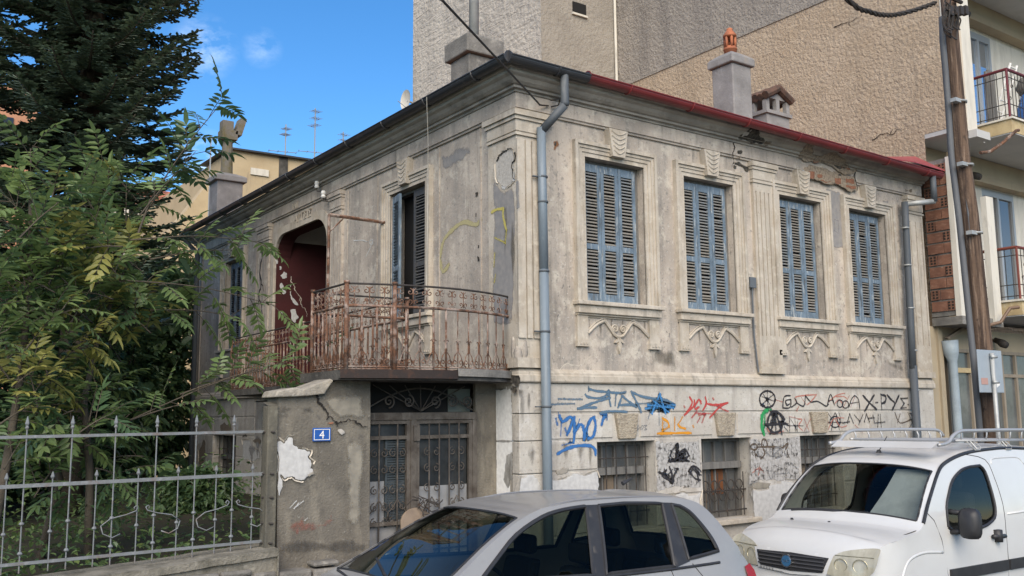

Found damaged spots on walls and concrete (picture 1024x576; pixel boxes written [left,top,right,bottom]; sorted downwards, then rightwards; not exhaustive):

spalling [799,143,858,248]
peeling [275,259,299,323]
crack [316,395,367,427]
peeling [277,434,315,496]